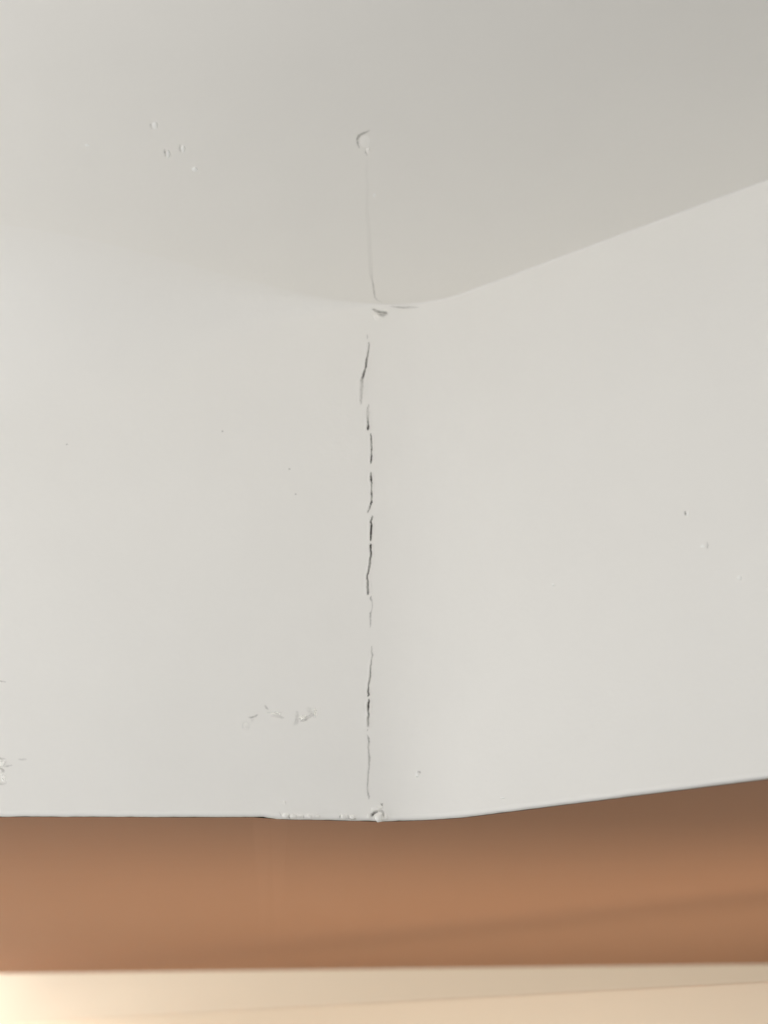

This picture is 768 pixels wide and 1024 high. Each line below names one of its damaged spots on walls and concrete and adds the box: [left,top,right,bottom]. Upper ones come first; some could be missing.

crack [355,342,376,595]
crack [364,647,376,727]